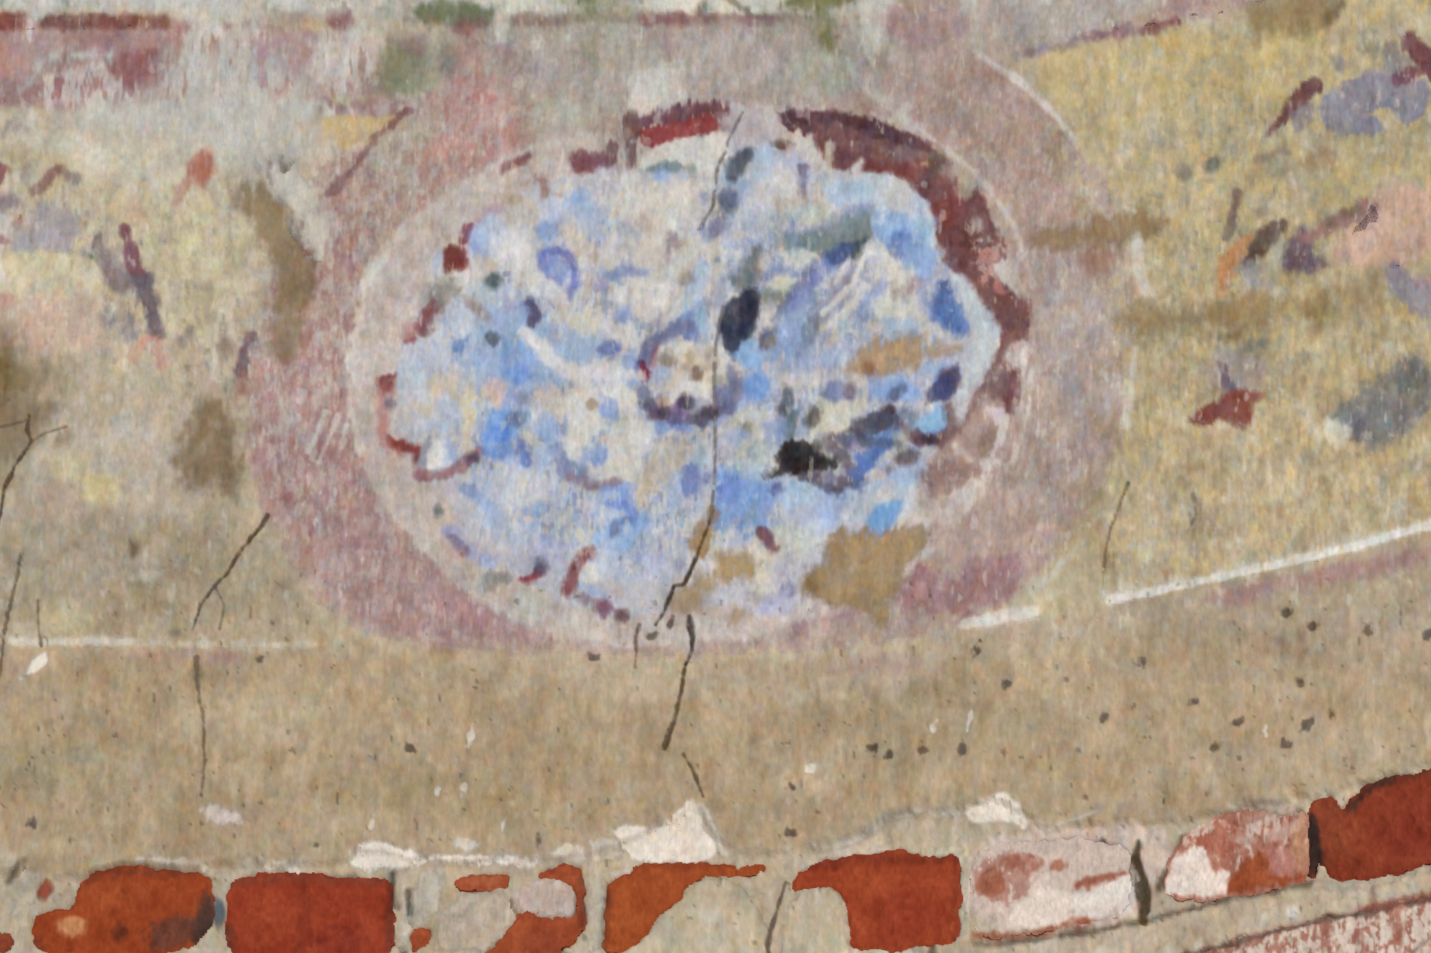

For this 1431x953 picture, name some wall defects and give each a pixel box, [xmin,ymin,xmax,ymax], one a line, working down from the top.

crack [702,117,740,225]
crack [0,415,33,517]
crack [635,310,723,796]
crack [0,554,42,669]
crack [194,513,270,787]
flaking render [0,933,14,953]
flaking render [8,854,766,953]
flaking render [792,808,1133,953]
flaking render [1157,769,1431,903]
flaking render [1198,898,1431,953]